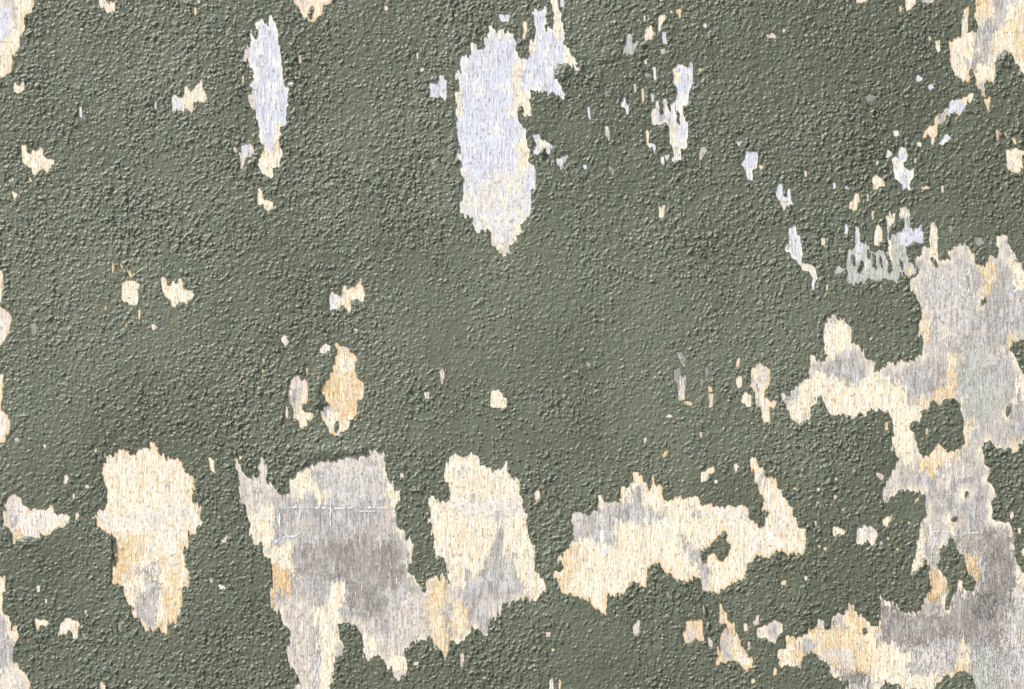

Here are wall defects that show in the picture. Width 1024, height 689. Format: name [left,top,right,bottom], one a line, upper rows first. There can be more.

peeling [0,0,34,94]
peeling [239,14,289,178]
peeling [429,0,579,257]
peeling [645,61,707,162]
peeling [922,0,1024,145]
peeling [160,276,194,307]
peeling [234,206,1024,689]
peeling [1,441,203,635]
peeling [0,574,30,689]